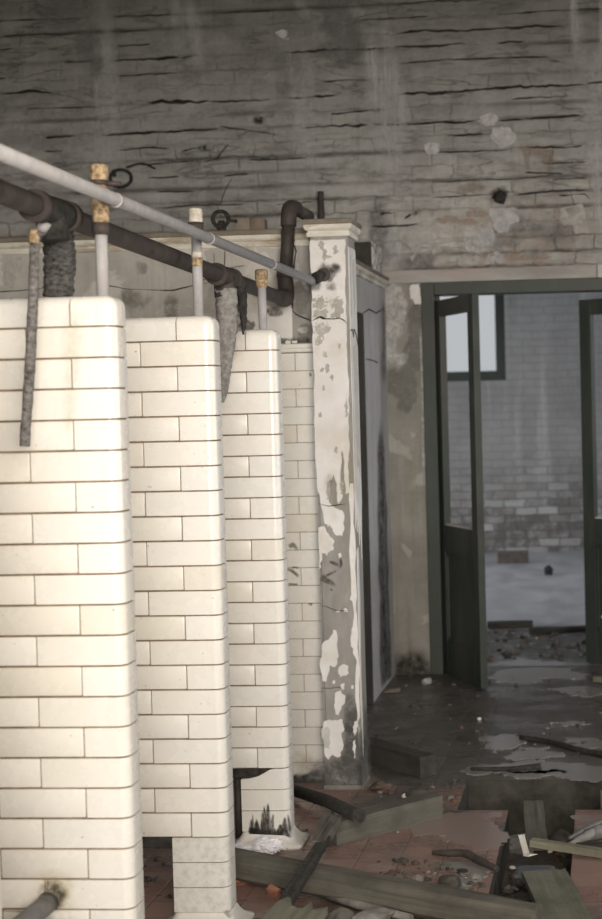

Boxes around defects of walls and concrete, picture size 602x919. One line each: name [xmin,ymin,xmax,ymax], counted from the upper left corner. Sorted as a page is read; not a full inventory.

crack [0,18,82,50]
crack [114,14,198,77]
crack [0,78,86,109]
crack [45,135,73,152]
crack [103,126,305,209]
crack [147,0,602,199]
peeling [478,111,517,149]
crack [374,212,418,228]
water stain [382,303,422,412]
peeling [309,239,363,760]